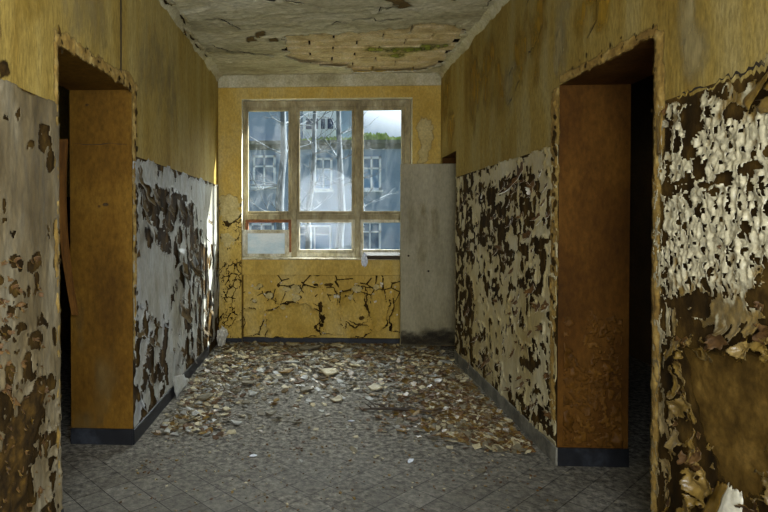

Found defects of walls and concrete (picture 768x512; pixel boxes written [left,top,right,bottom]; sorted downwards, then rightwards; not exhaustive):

crack [332,6,399,25]
spalling [386,0,412,9]
crack [207,44,274,57]
spalling [247,23,464,71]
peeling [0,25,400,512]
peeling [454,24,768,512]